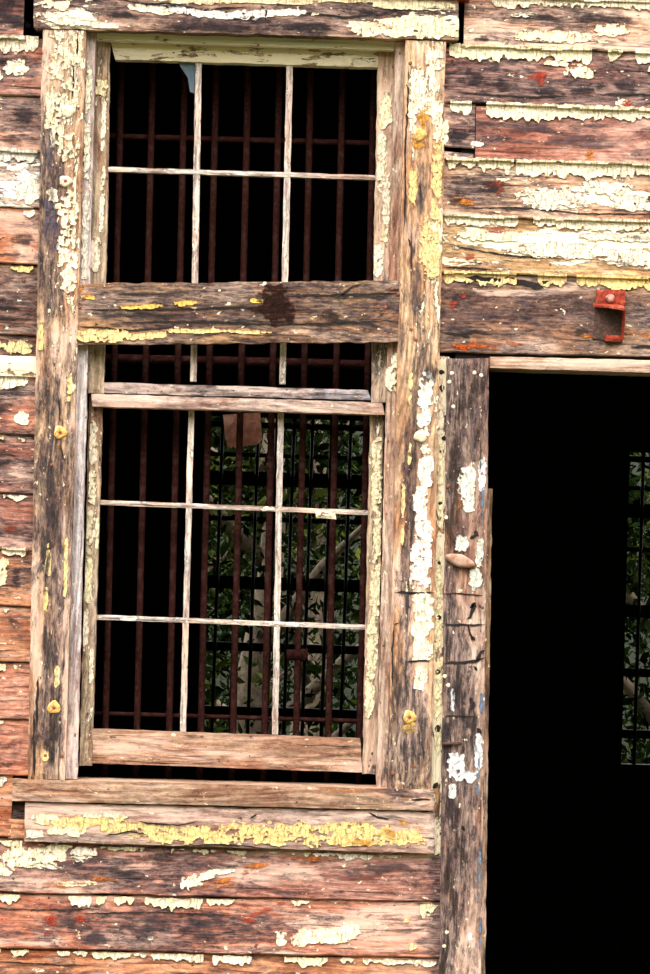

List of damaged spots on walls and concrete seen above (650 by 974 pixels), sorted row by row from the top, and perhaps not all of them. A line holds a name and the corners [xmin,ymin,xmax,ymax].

peeling [0,0,119,300]
peeling [128,0,650,291]
corrosion [250,283,296,327]
peeling [0,320,44,354]
peeling [77,328,272,343]
peeling [385,353,444,429]
peeling [400,443,487,799]
peeling [0,813,441,876]
peeling [57,868,235,912]
peeling [57,951,252,966]
peeling [276,922,361,968]
peeling [340,943,436,967]